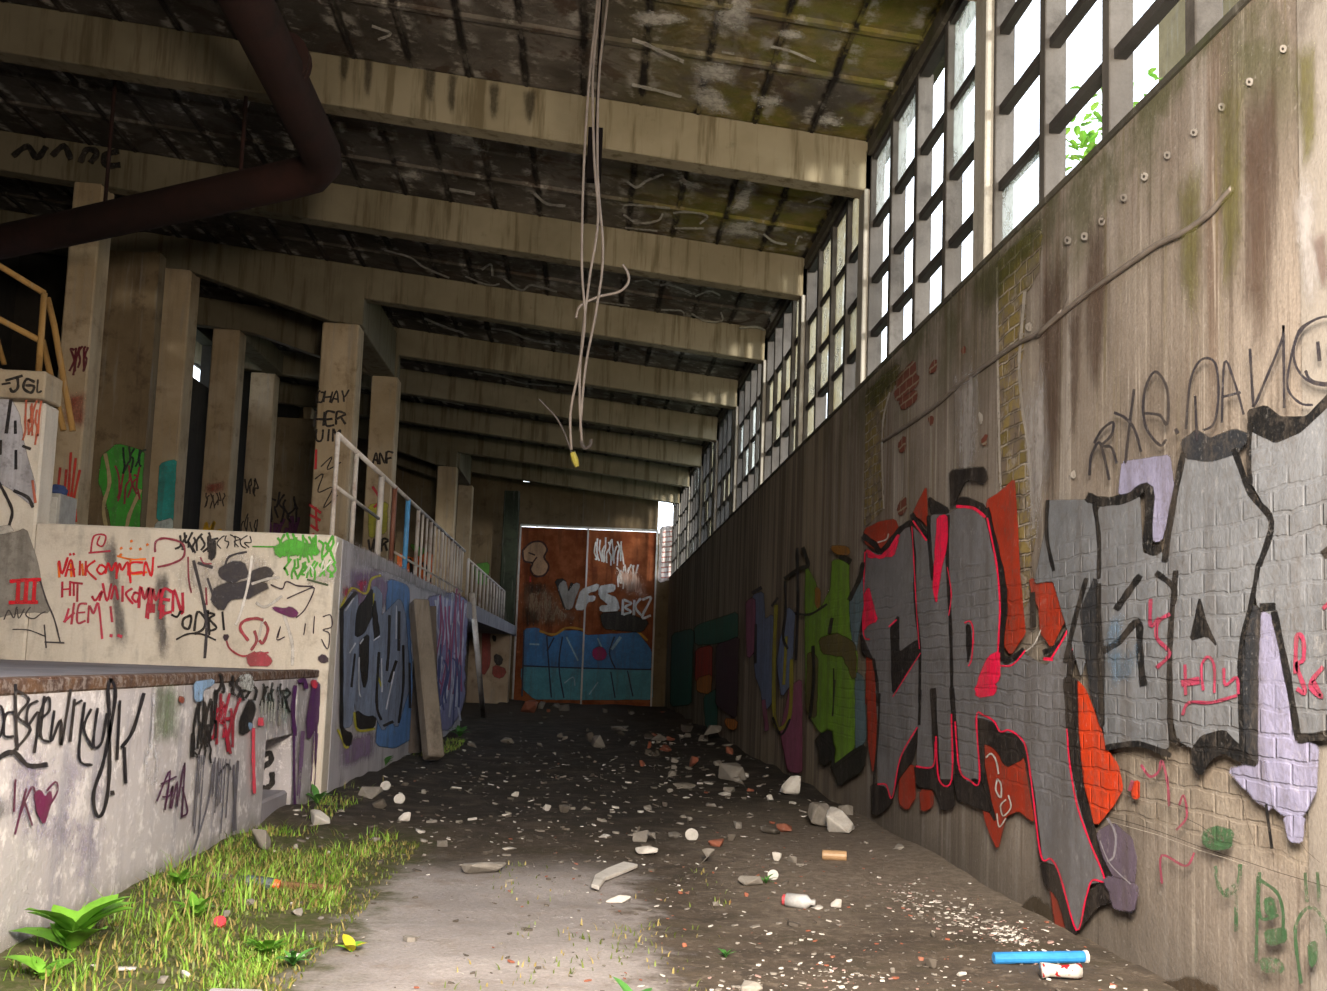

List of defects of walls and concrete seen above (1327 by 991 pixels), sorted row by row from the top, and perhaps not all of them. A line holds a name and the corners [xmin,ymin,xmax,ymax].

water stain [1300,52,1314,152]
water stain [1183,180,1199,296]
water stain [1222,82,1273,316]
water stain [1299,196,1327,293]
water stain [959,377,976,469]
flaking render [978,230,1043,608]
water stain [1025,236,1105,518]